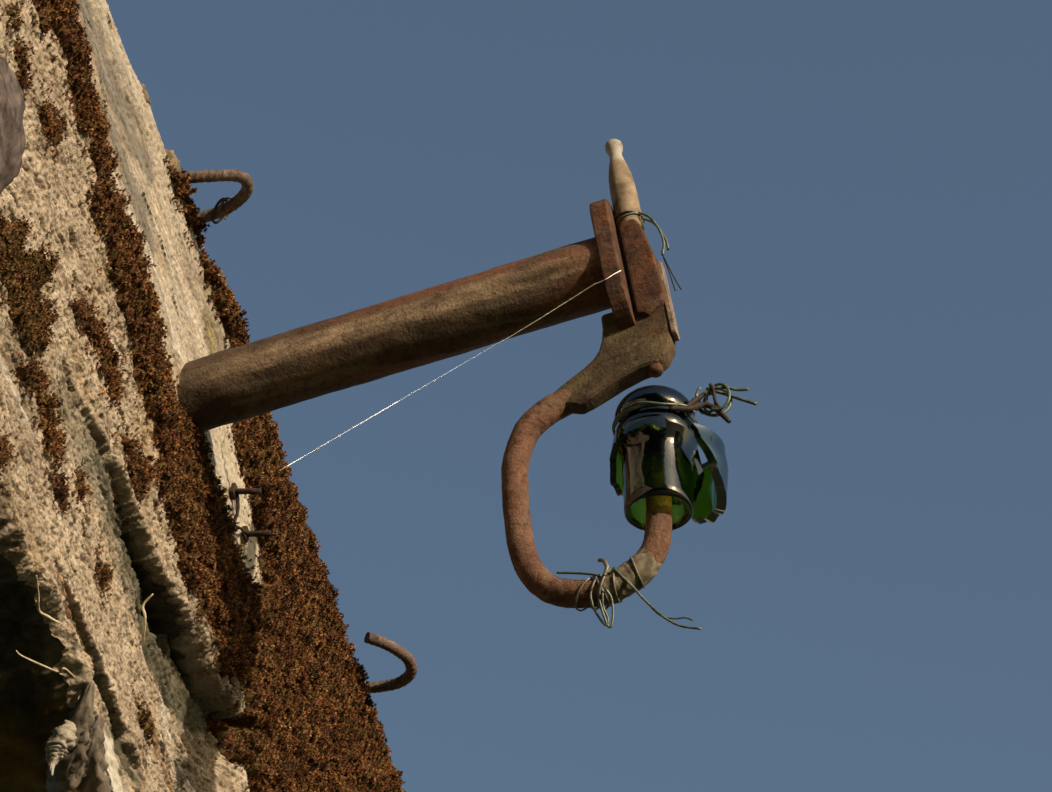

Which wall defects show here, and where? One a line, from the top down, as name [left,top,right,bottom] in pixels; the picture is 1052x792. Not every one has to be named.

spalling [108,707,138,780]